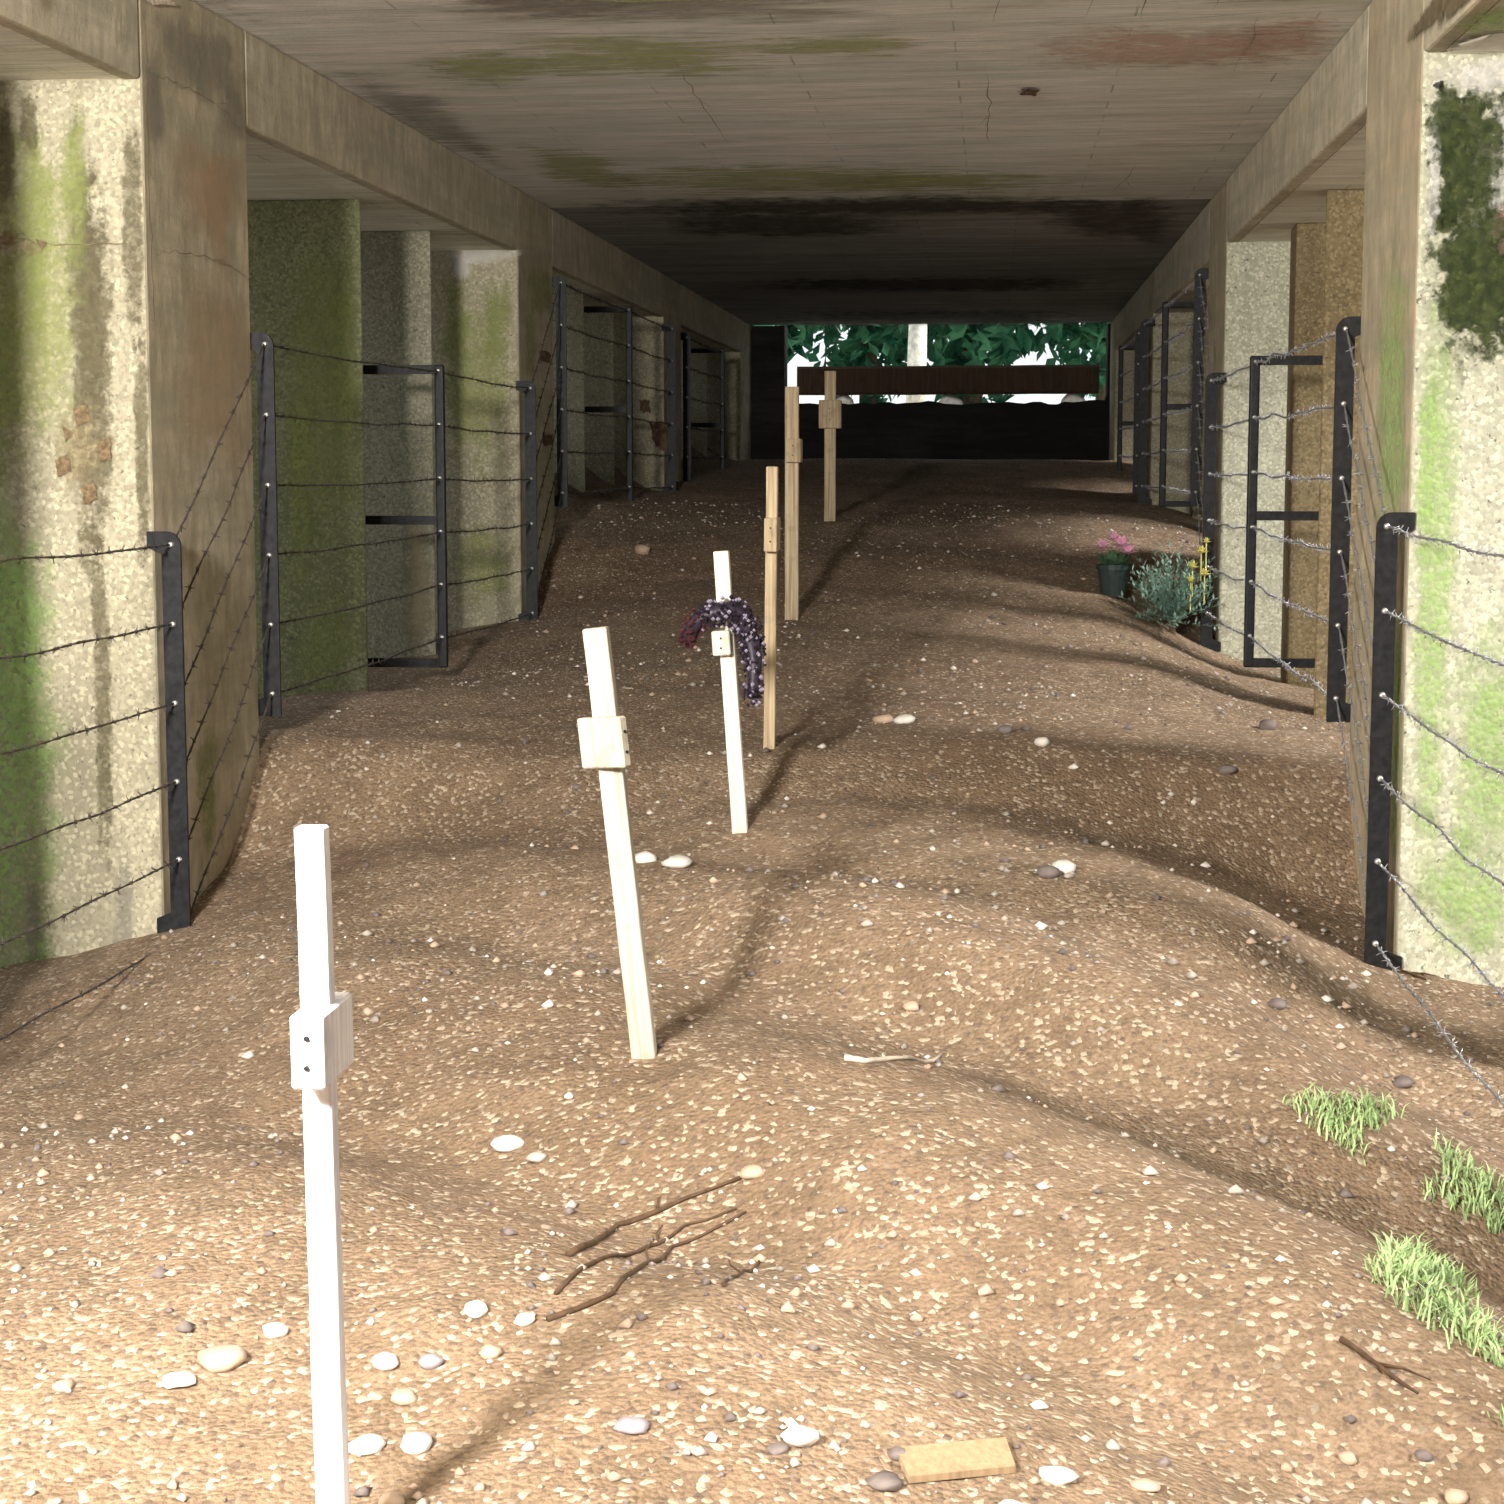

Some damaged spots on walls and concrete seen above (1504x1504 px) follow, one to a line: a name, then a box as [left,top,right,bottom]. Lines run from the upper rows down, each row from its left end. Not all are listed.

leakage [763,35,913,56]
leakage [1408,0,1504,42]
leakage [0,102,47,326]
leakage [654,175,1166,242]
leakage [1423,62,1504,350]
leakage [64,121,143,844]
leakage [133,343,150,555]
leakage [0,560,37,733]